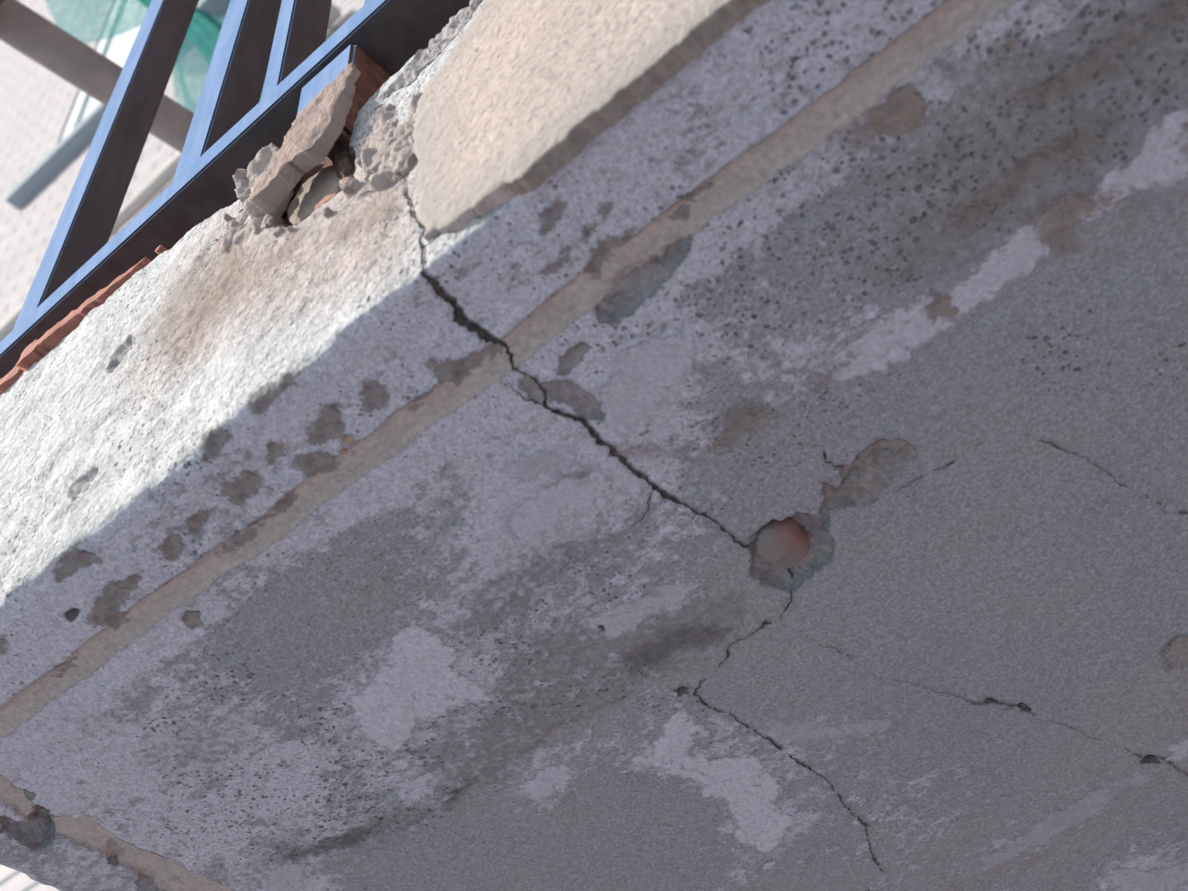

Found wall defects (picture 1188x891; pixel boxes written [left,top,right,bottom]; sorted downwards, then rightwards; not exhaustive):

spalling [347,115,357,178]
crack [402,174,750,548]
spalling [749,438,918,590]
crack [896,441,982,492]
crack [1026,435,1188,515]
crack [693,568,883,891]
crack [808,637,1188,776]
spalling [0,788,56,852]